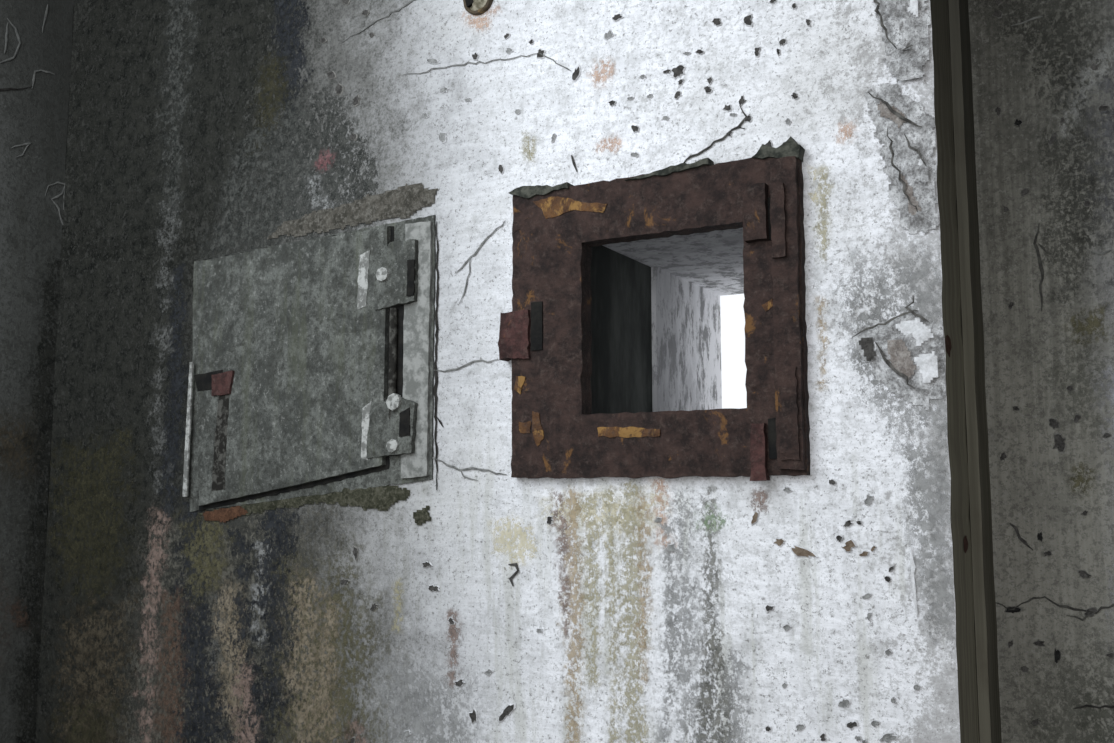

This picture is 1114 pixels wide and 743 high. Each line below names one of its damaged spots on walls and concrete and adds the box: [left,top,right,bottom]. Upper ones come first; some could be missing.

crack [683,100,747,163]
corrosion [533,196,607,219]
leakage [11,0,466,743]
corrosion [519,411,544,446]
corrosion [597,427,661,438]
leakage [751,490,768,512]
leakage [495,519,537,561]
leakage [657,488,750,743]
crack [995,596,1114,621]